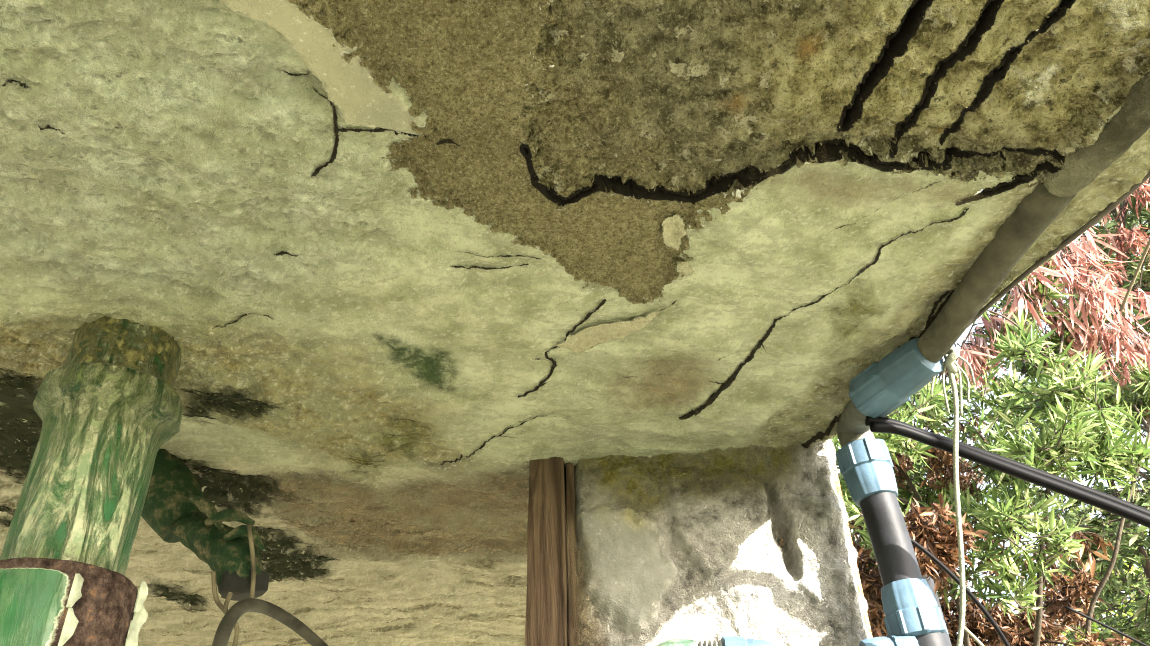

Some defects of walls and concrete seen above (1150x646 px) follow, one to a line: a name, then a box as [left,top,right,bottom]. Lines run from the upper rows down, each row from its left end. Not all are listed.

spalling [288,0,1150,355]
crack [679,208,969,420]
mould [0,368,42,484]
water stain [183,389,277,420]
crack [440,299,606,465]
crack [801,413,842,448]
mould [0,506,15,527]